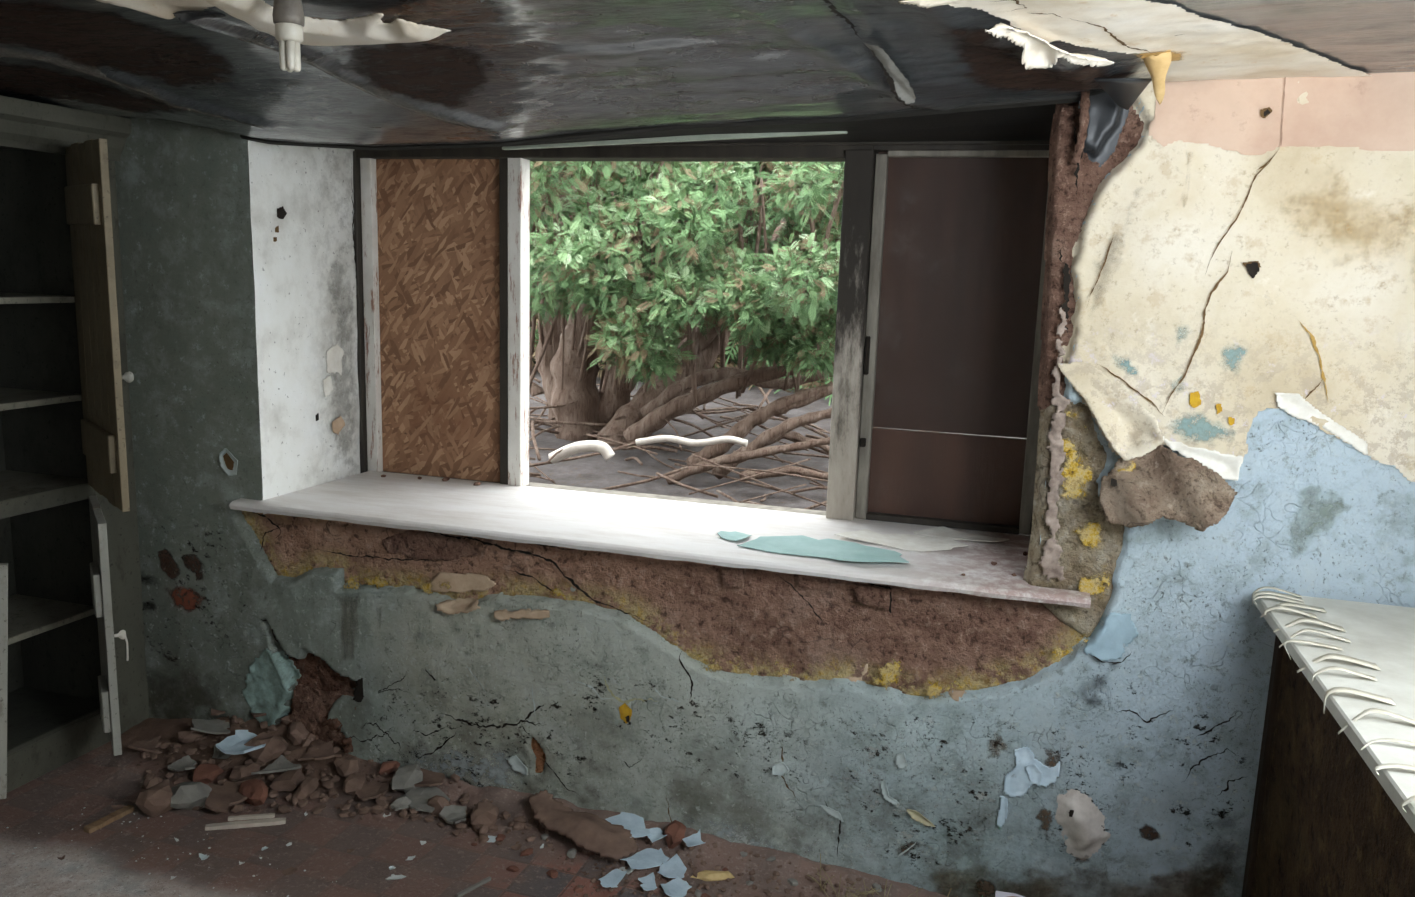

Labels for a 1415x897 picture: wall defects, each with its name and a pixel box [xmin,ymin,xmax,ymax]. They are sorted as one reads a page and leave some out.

damp [0,2,258,127]
peeling [97,0,275,37]
crack [1102,77,1286,415]
peeling [241,0,1415,701]
peeling [219,448,238,476]
flaking render [242,619,364,754]
peeling [369,668,810,796]
peeling [1117,699,1224,781]
peeling [846,714,1109,897]
damp [934,872,1071,897]
peeling [1139,825,1162,852]
damp [1101,869,1224,897]